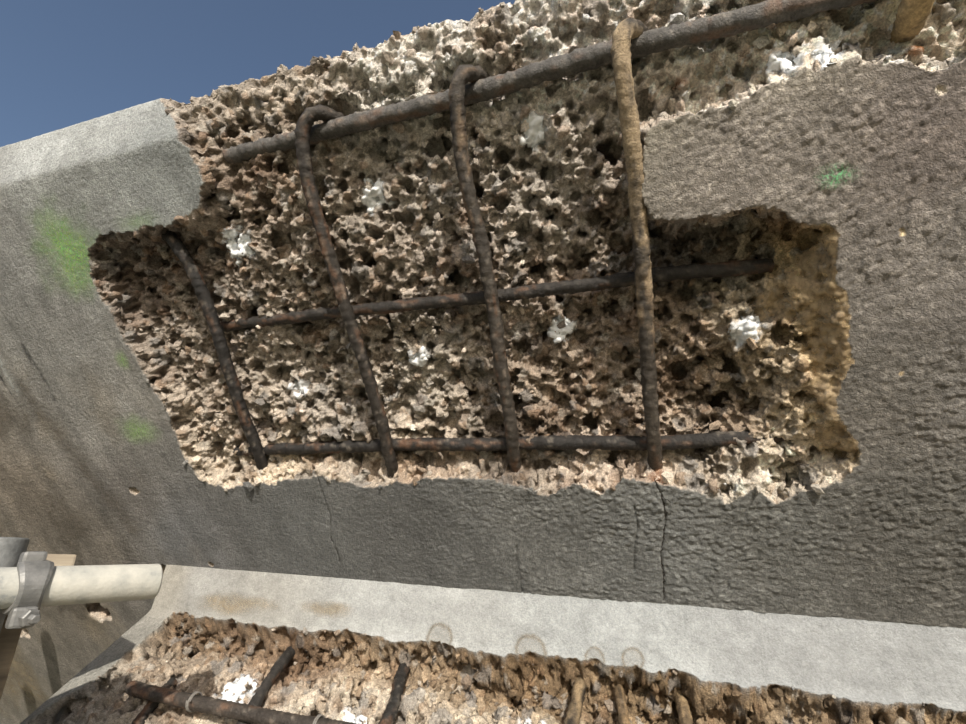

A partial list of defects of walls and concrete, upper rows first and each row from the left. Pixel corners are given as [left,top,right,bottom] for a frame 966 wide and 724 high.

spalling [631,0,966,179]
spalling [87,0,861,505]
corrosion [750,236,858,458]
crack [654,478,671,600]
spalling [27,611,966,724]